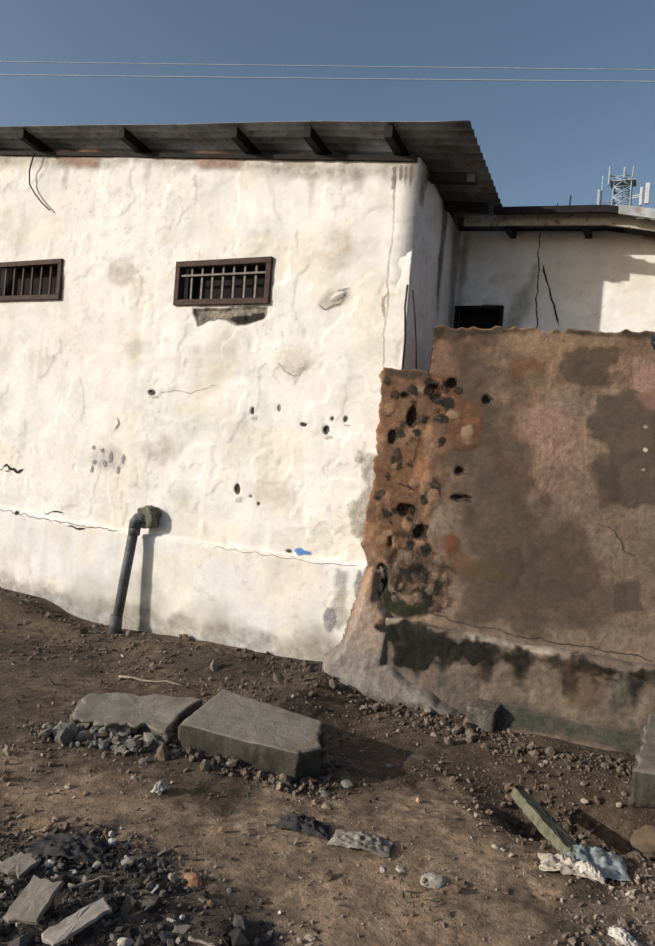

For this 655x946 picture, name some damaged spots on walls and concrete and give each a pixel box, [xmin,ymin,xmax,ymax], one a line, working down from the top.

spalling [193,307,268,326]
crack [381,174,396,365]
water stain [437,210,463,299]
crack [535,228,559,329]
crack [0,464,23,474]
crack [2,510,116,531]
spalling [323,376,493,632]
water stain [433,317,641,629]
water stain [587,389,655,507]
water stain [374,584,534,679]
water stain [549,651,616,695]
water stain [628,669,654,698]